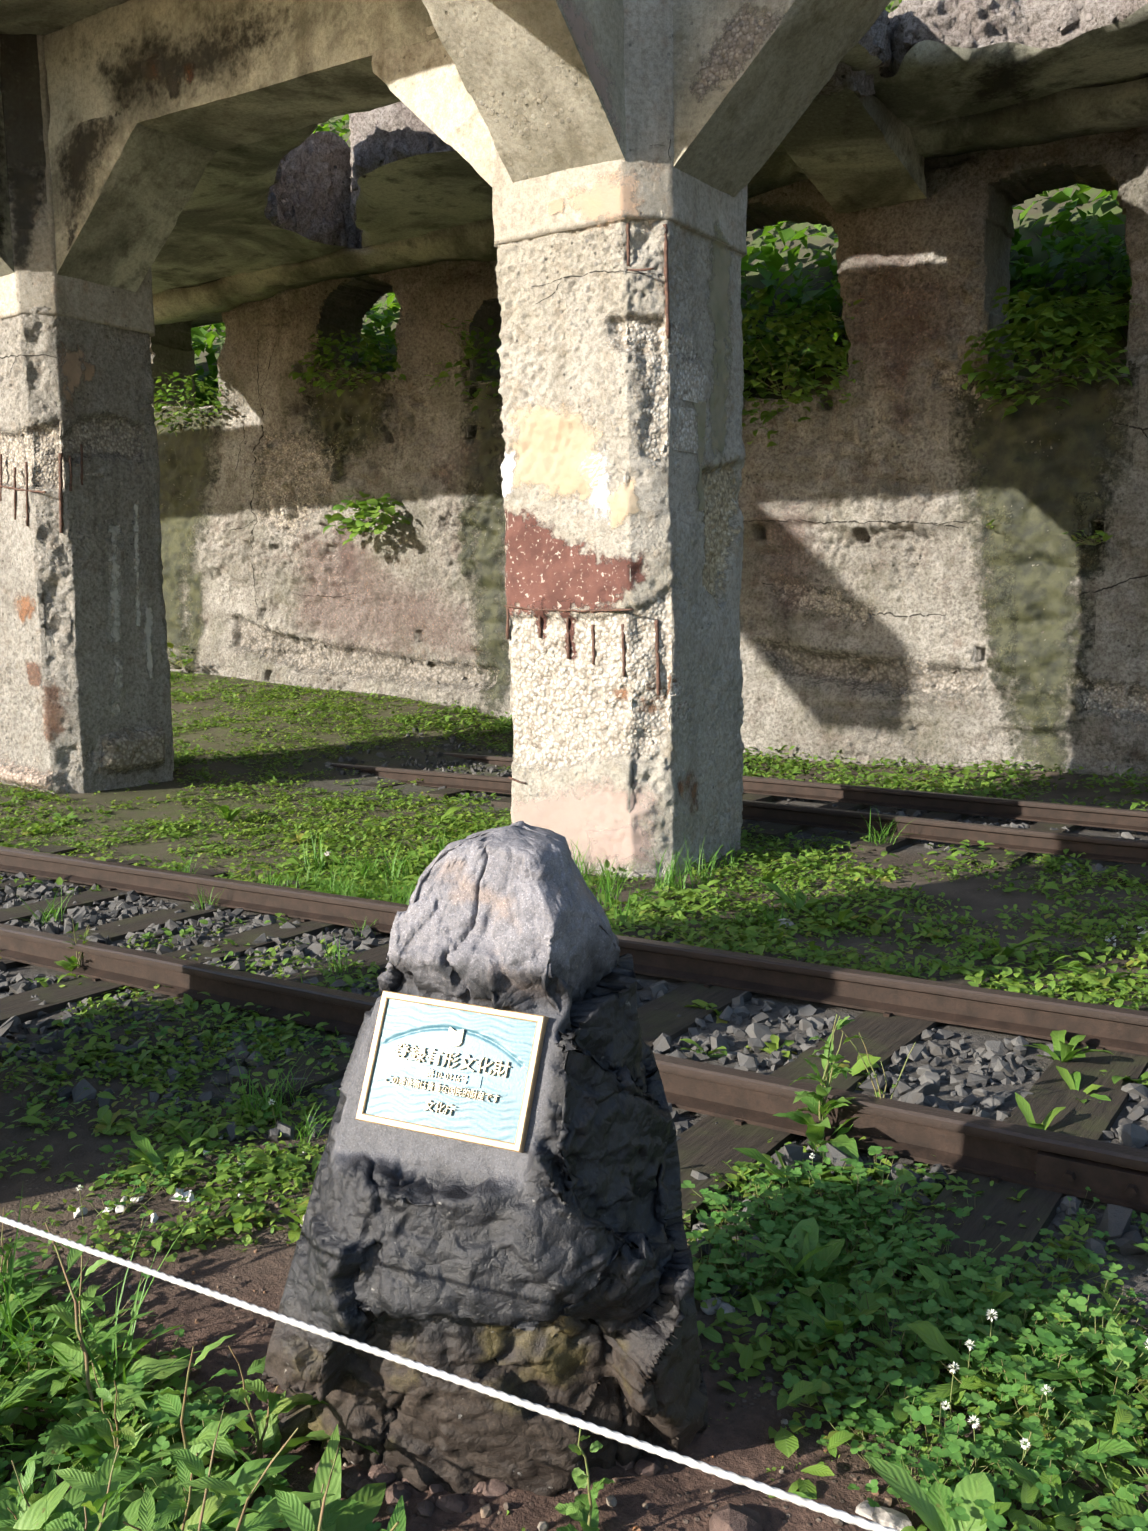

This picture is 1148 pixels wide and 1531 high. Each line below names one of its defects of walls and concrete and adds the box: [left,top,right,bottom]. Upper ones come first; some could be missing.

water stain [0,8,292,268]
spalling [547,171,709,472]
corrosion [17,596,35,622]
corrosion [26,662,64,741]
spalling [228,583,690,870]
peeling [501,450,516,498]
corrosion [504,404,648,659]
peeling [579,451,611,520]
corrosion [615,677,685,713]
water stain [949,361,1140,772]